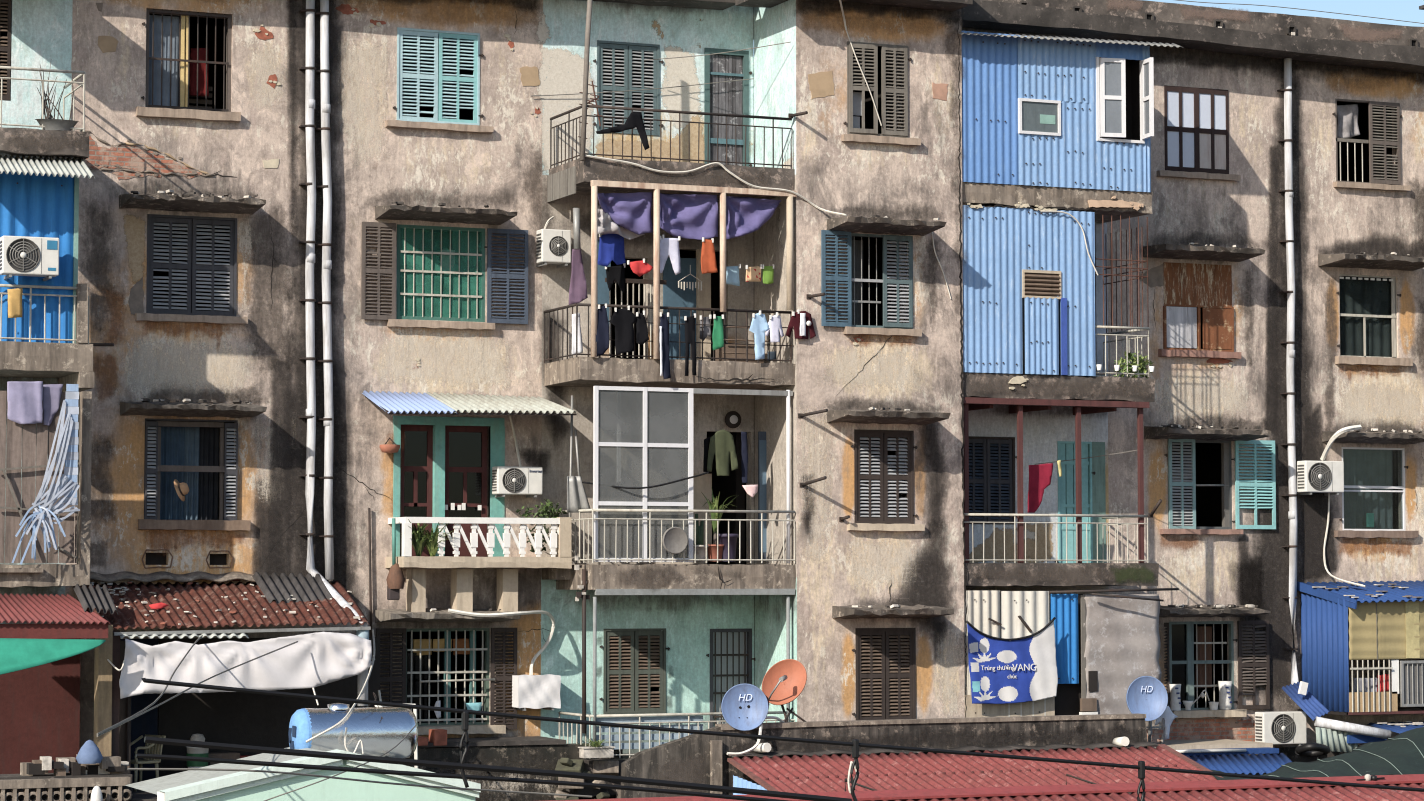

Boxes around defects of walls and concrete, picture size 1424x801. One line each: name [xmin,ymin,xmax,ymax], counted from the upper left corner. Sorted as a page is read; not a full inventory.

damp [469,0,537,10]
peeling [530,12,705,173]
flaking render [79,130,214,180]
damp [85,206,116,331]
damp [128,0,388,600]
damp [376,334,513,387]
damp [973,378,1245,416]
damp [1147,45,1424,693]
damp [91,440,115,519]
damp [90,543,106,565]
damp [850,423,961,711]